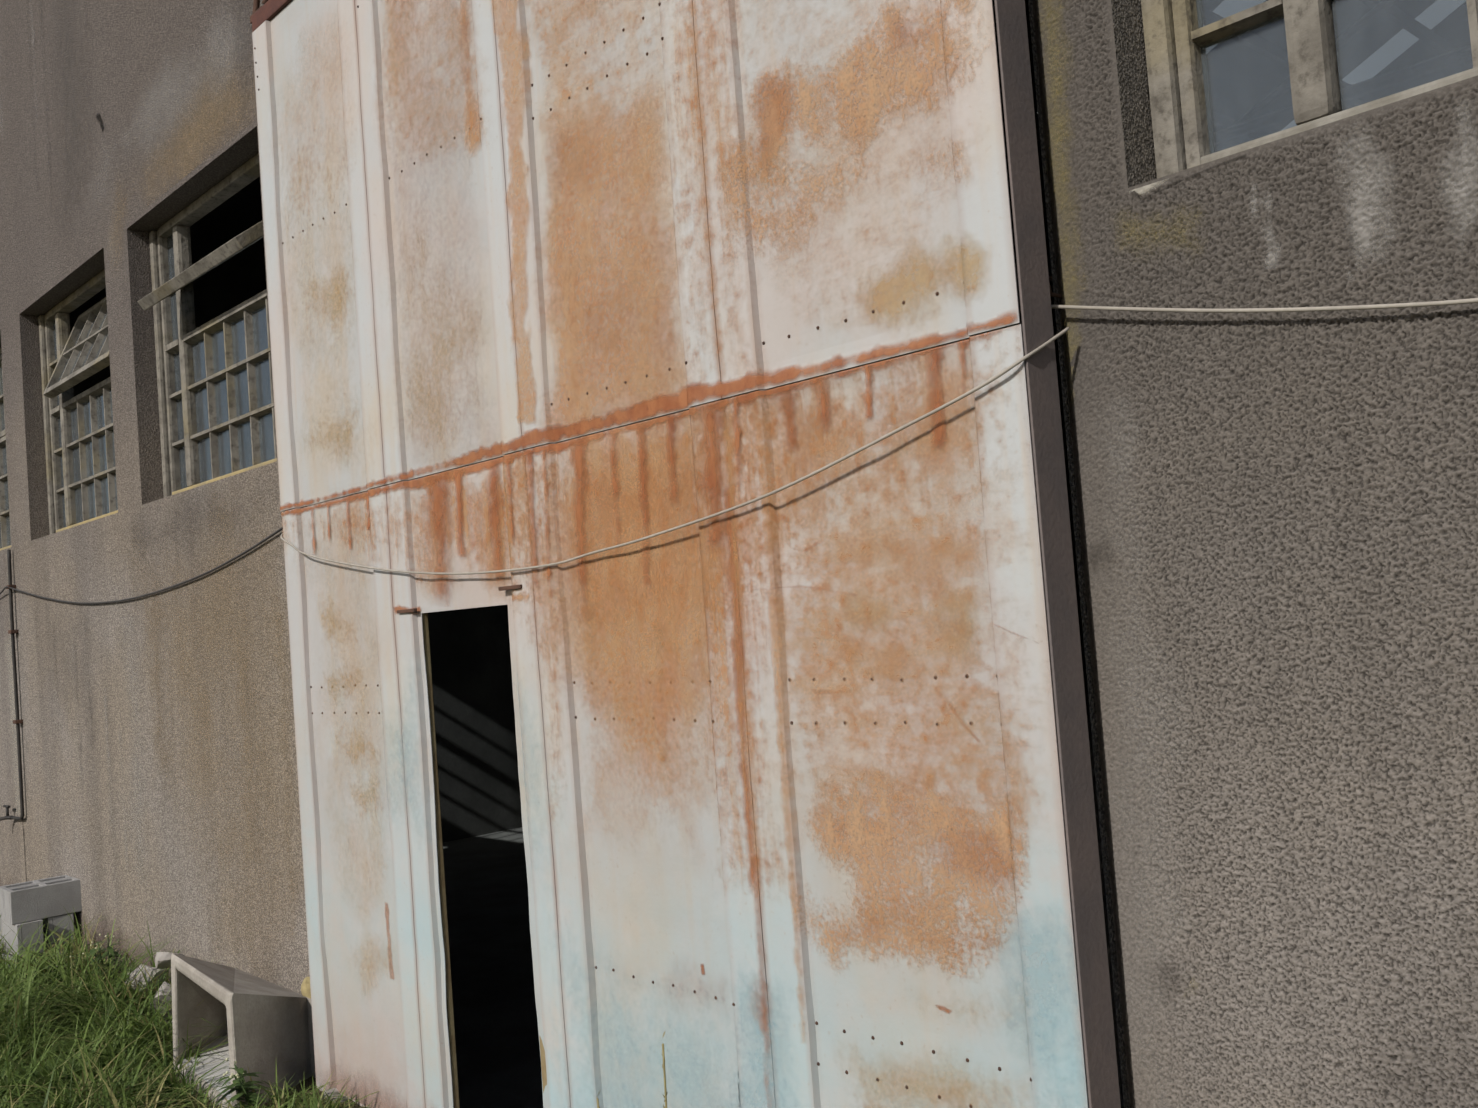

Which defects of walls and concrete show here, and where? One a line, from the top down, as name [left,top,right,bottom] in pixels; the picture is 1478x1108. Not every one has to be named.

rust [494,1,605,310]
rust [678,0,973,242]
rust [872,248,980,317]
rust [280,314,1015,882]